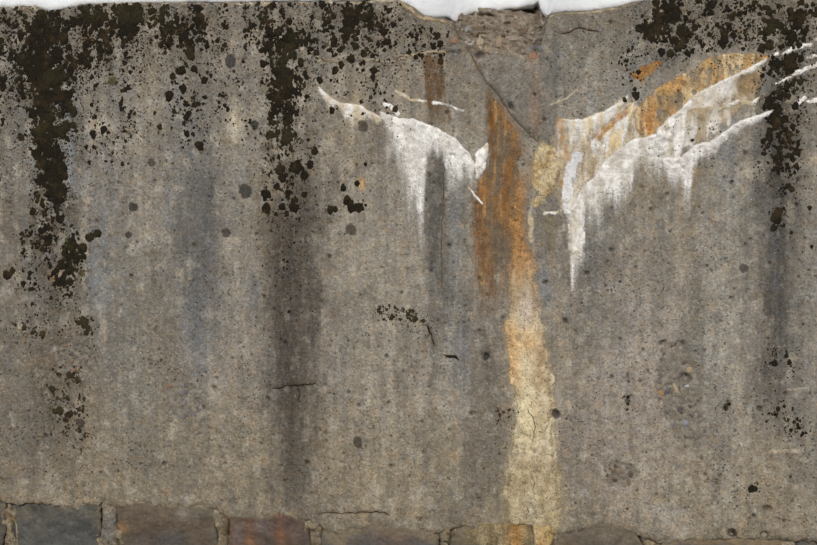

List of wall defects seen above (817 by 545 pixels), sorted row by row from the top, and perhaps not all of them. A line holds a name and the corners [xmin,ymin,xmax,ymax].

leakage [318,87,488,225]
leakage [364,50,446,64]
corrosion [472,89,523,298]
crack [468,50,538,142]
leakage [468,38,817,545]